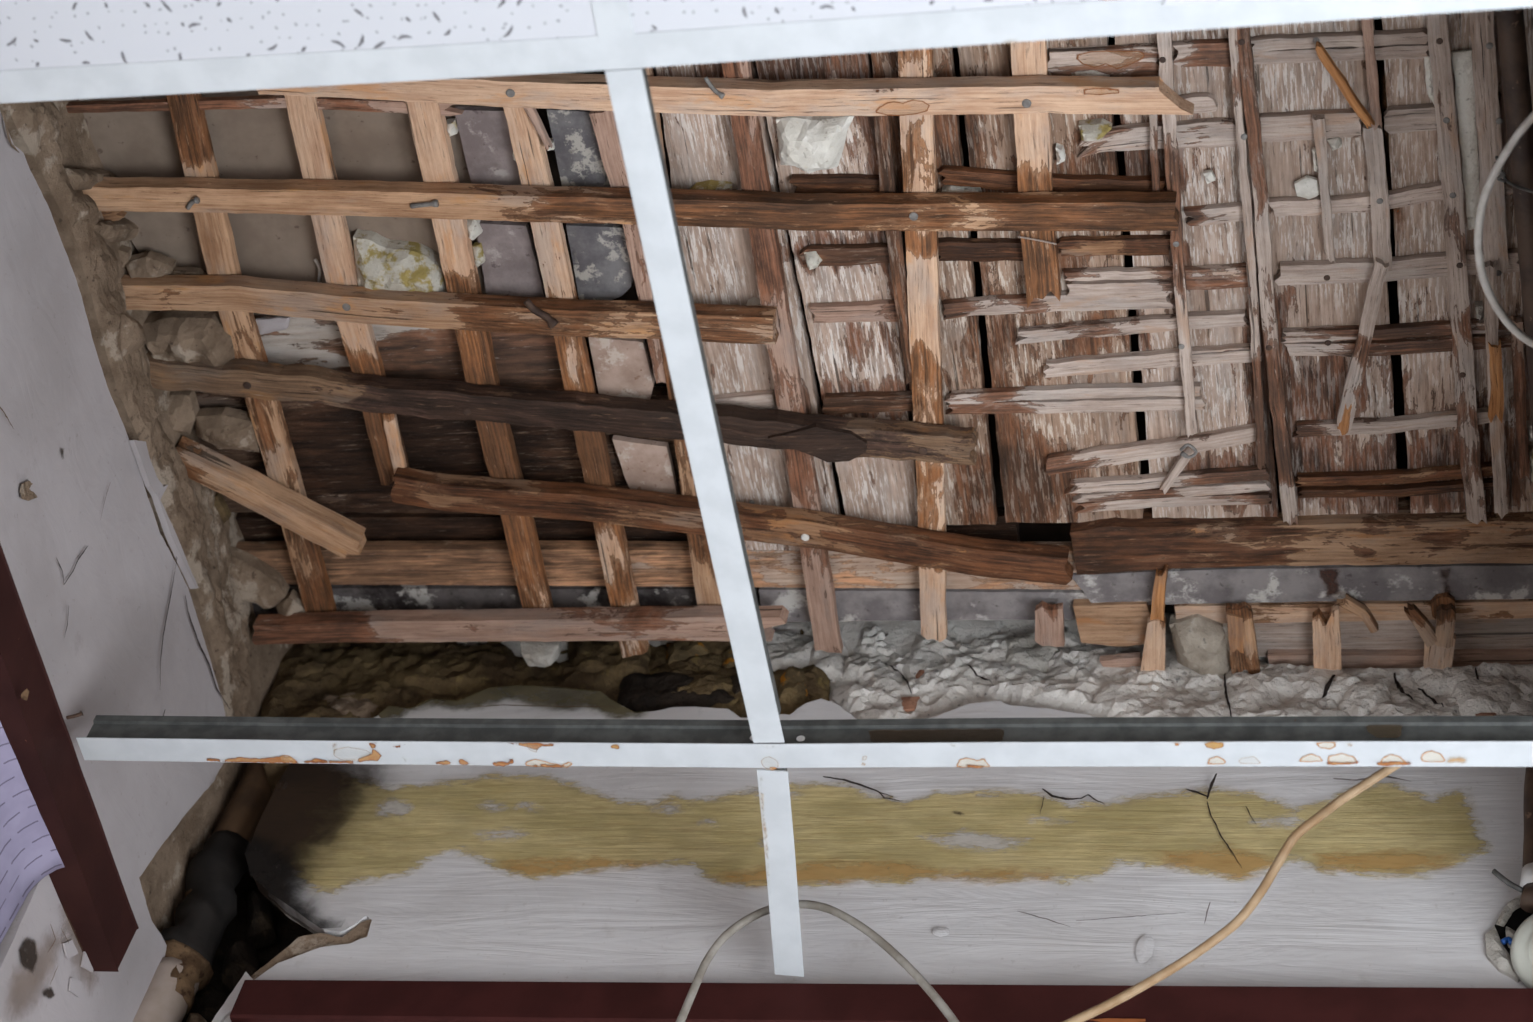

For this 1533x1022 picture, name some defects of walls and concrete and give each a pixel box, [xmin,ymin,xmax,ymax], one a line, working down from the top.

spalling [0,101,748,718]
spalling [767,613,1533,719]
spalling [262,763,289,793]
rust [207,743,400,764]
leakage [253,763,767,893]
rust [492,743,572,768]
crack [1040,789,1104,813]
leakage [789,783,1488,887]
crack [1186,773,1256,868]
rust [1367,725,1465,766]
spalling [186,890,372,1022]
crack [1018,903,1210,927]